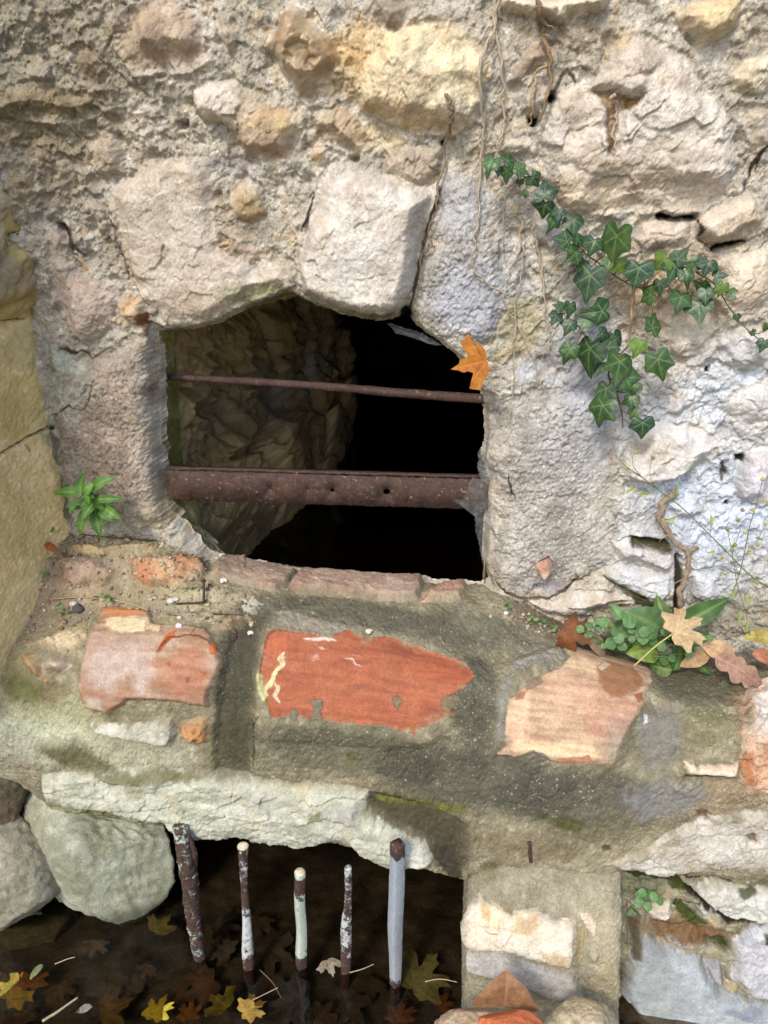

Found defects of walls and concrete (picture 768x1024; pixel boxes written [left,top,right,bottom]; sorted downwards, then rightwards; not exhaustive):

crack [301,193,315,231]
spalling [152,623,182,652]
spalling [526,750,592,764]